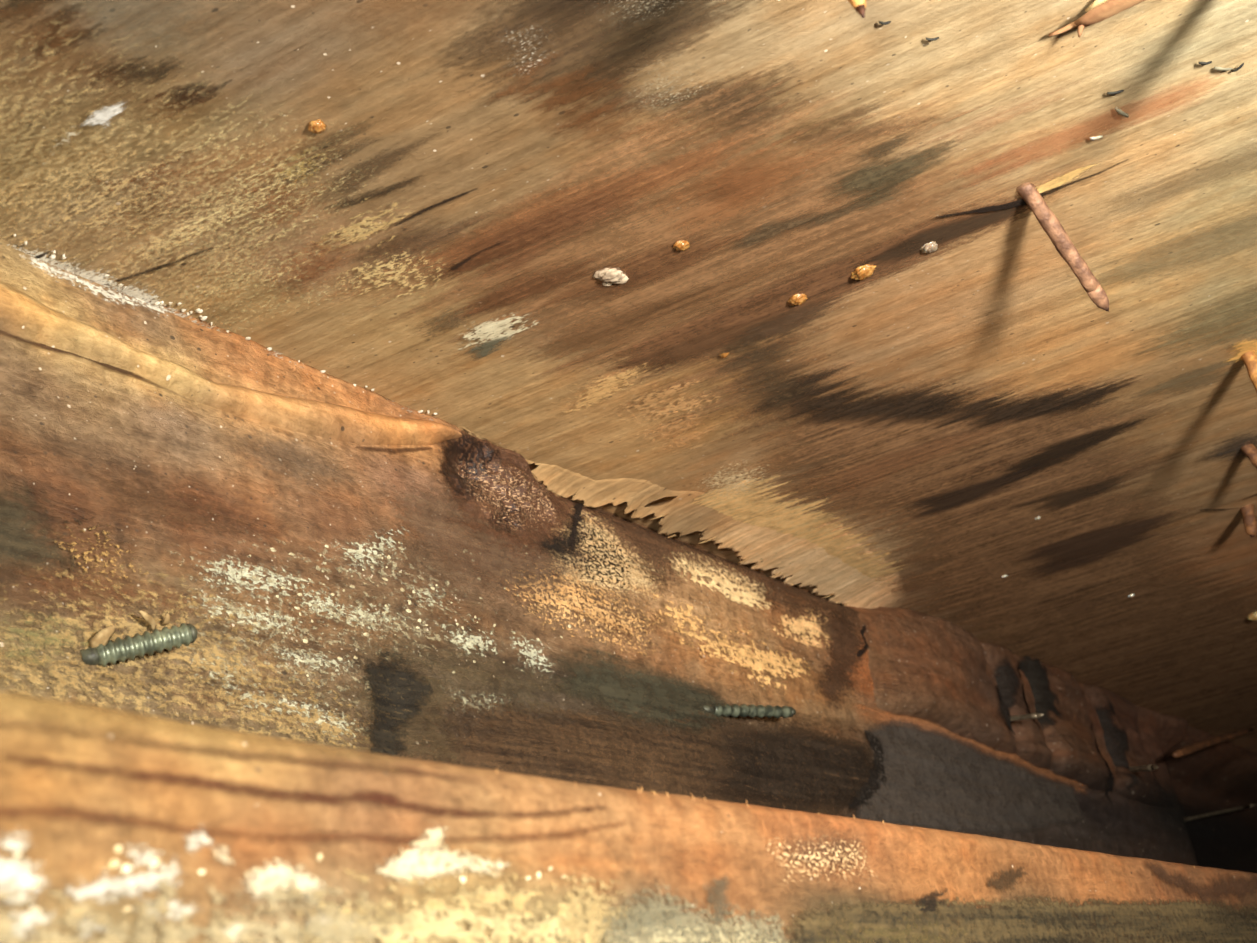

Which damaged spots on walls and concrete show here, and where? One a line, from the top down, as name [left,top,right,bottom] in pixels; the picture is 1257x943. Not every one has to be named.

crack [1,331,172,392]
water stain [0,0,1257,737]
crack [364,445,432,453]
water stain [0,488,1083,836]
water stain [0,827,1257,943]